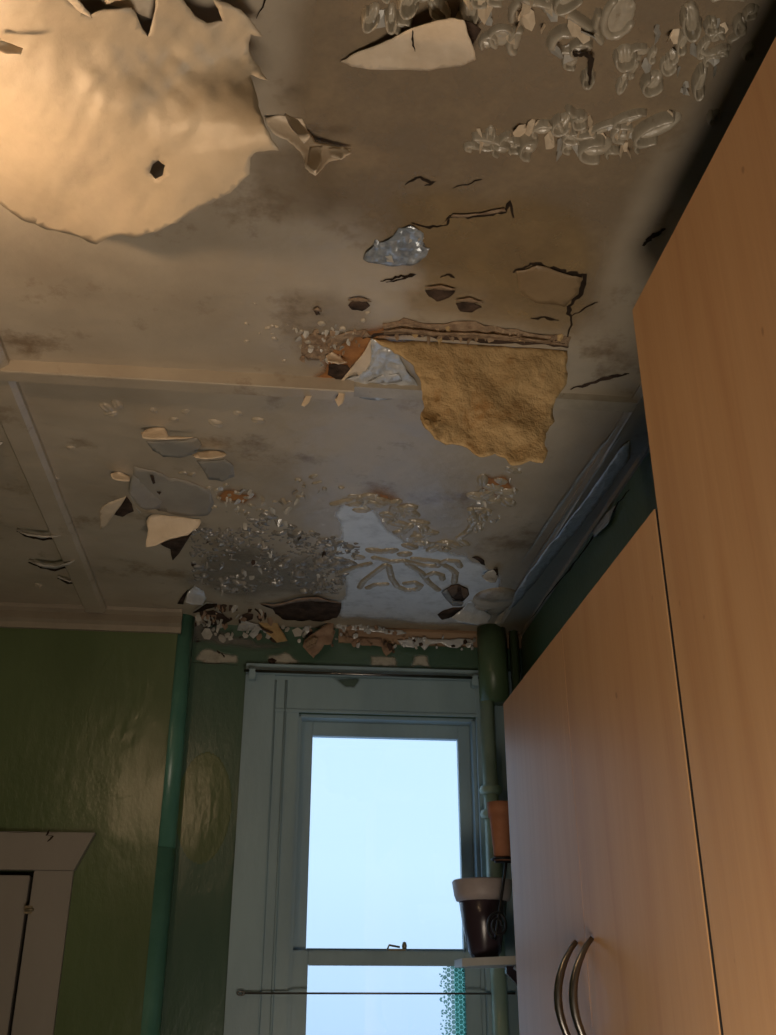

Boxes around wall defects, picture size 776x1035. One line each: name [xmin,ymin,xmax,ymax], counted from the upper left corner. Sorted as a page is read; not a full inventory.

peeling [340,0,493,71]
peeling [506,0,590,64]
peeling [0,0,351,244]
crack [405,176,482,188]
crack [411,201,514,229]
peeling [301,285,571,531]
peeling [141,427,234,482]
peeling [100,496,134,529]
peeling [146,514,201,560]
peeling [177,441,630,666]